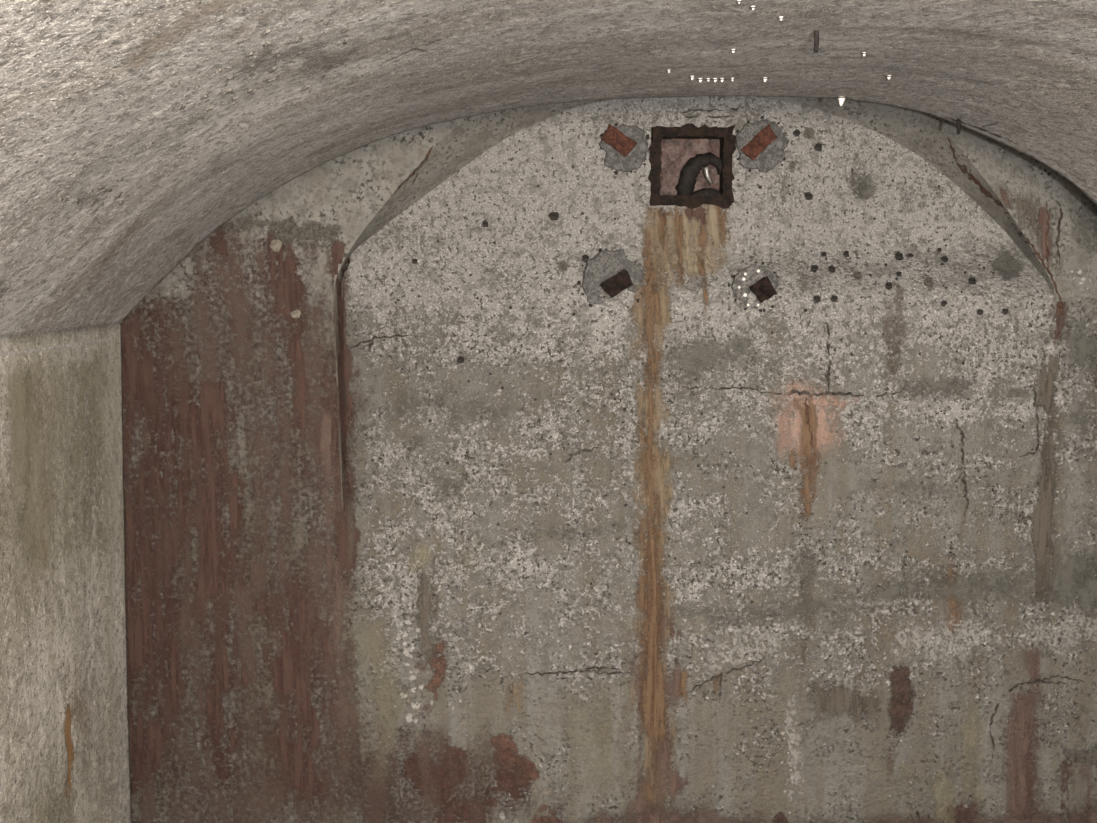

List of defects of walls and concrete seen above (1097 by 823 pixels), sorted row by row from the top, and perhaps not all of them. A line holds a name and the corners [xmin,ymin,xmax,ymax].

rust [1001,188,1058,265]
rust [122,229,388,823]
rust [587,204,763,823]
rust [777,383,847,521]
rust [1032,302,1066,602]
rust [65,698,83,793]
rust [869,646,1097,823]